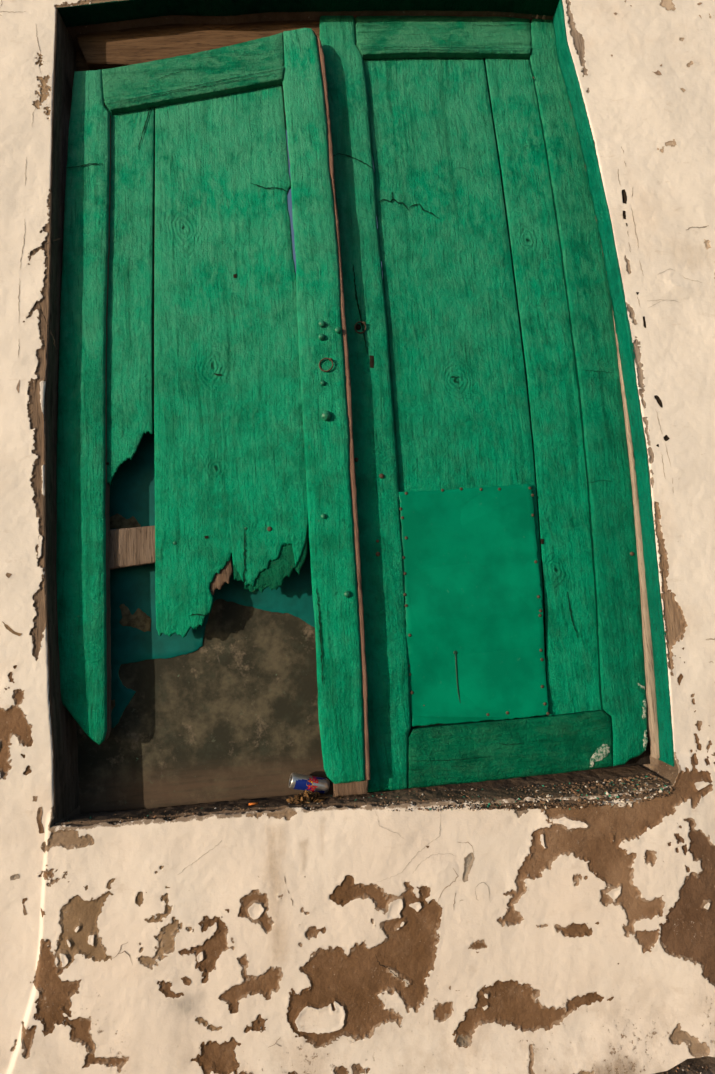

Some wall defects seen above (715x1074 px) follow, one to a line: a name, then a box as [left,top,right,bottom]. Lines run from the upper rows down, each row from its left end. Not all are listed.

peeling [54,0,122,9]
peeling [566,0,590,93]
peeling [626,292,654,488]
peeling [654,502,688,685]
peeling [462,852,475,882]
peeling [497,694,715,986]
peeling [10,878,129,1073]
peeling [138,875,614,1074]